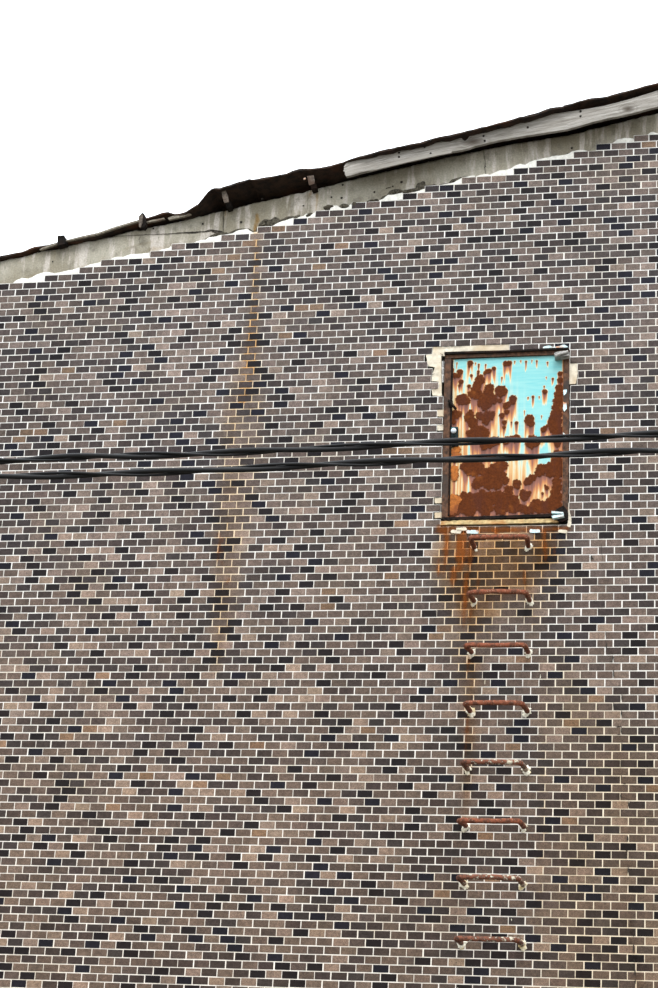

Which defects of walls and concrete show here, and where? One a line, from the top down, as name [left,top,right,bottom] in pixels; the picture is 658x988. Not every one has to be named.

corrosion [449,360,563,534]